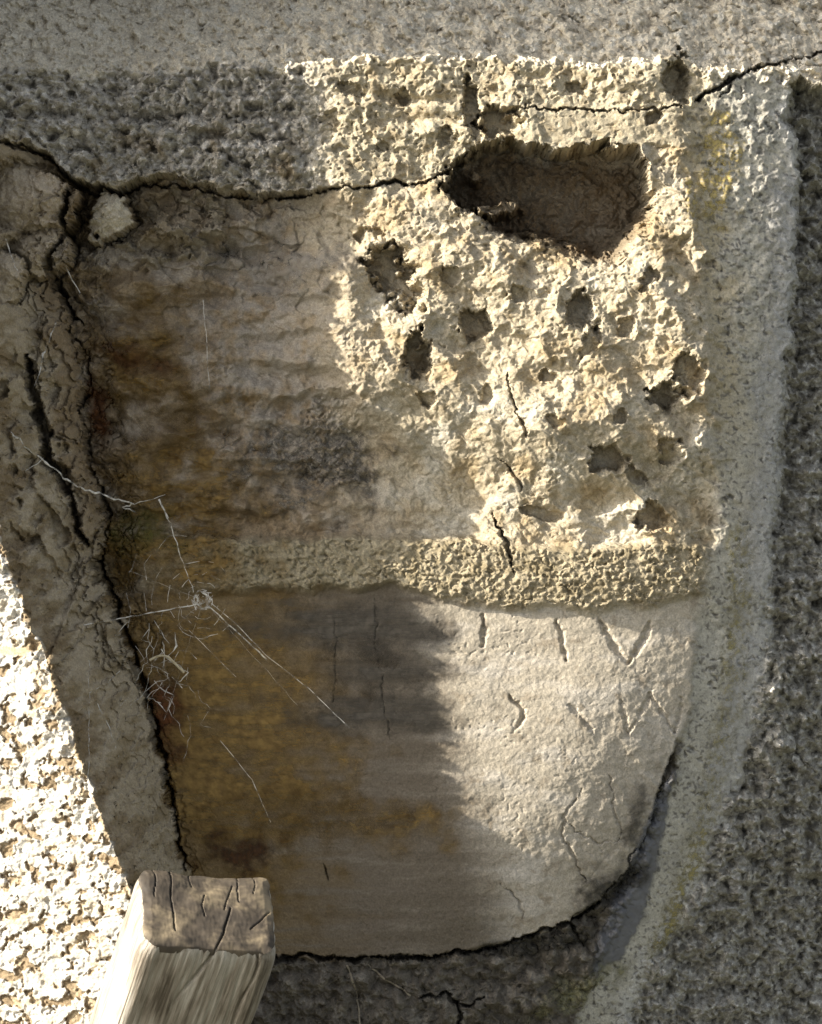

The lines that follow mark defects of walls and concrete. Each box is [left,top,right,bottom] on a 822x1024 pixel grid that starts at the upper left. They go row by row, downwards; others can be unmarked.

crack [520,49,822,114]
crack [0,140,443,871]
leakage [102,293,378,600]
spalling [35,130,717,547]
crack [492,512,515,572]
crack [498,458,524,491]
crack [506,371,529,437]
leakage [125,593,458,871]
leakage [233,861,282,902]
crack [273,775,637,966]